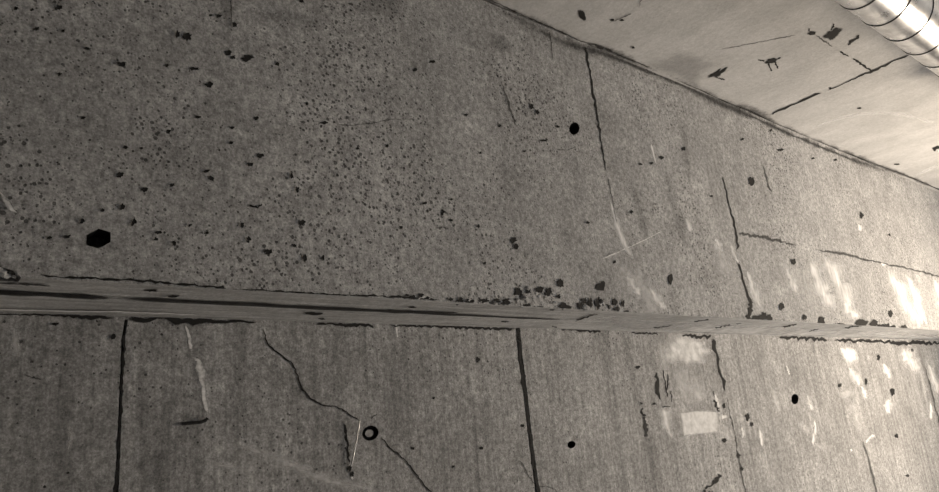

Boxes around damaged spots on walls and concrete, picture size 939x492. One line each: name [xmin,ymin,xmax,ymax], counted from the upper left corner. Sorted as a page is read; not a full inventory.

crack [491,0,647,67]
damp [810,250,939,321]
damp [841,348,867,398]
damp [902,350,939,393]
crack [263,329,432,492]
crack [703,474,722,492]